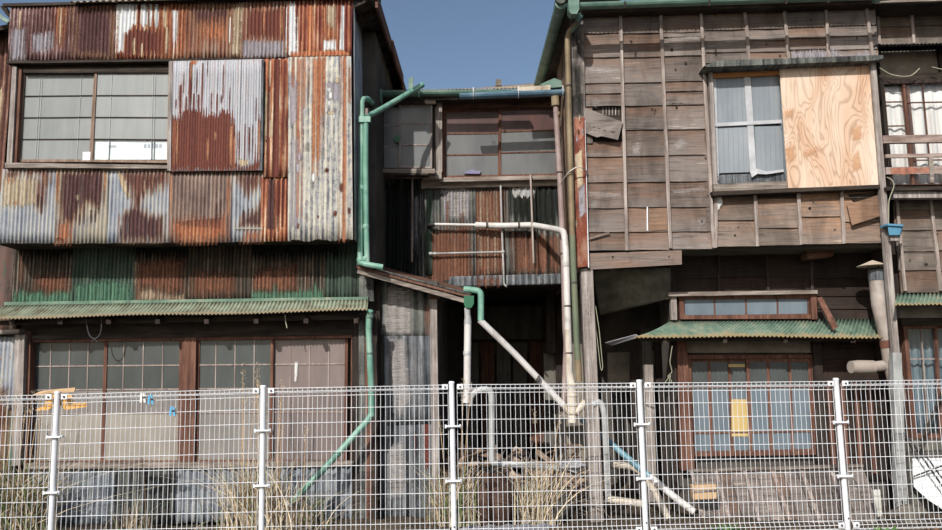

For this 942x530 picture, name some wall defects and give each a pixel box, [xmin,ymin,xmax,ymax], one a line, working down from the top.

corrosion [54,3,351,244]
corrosion [0,169,106,243]
corrosion [427,189,560,293]
corrosion [34,273,69,294]
corrosion [134,258,236,300]
corrosion [254,265,308,292]